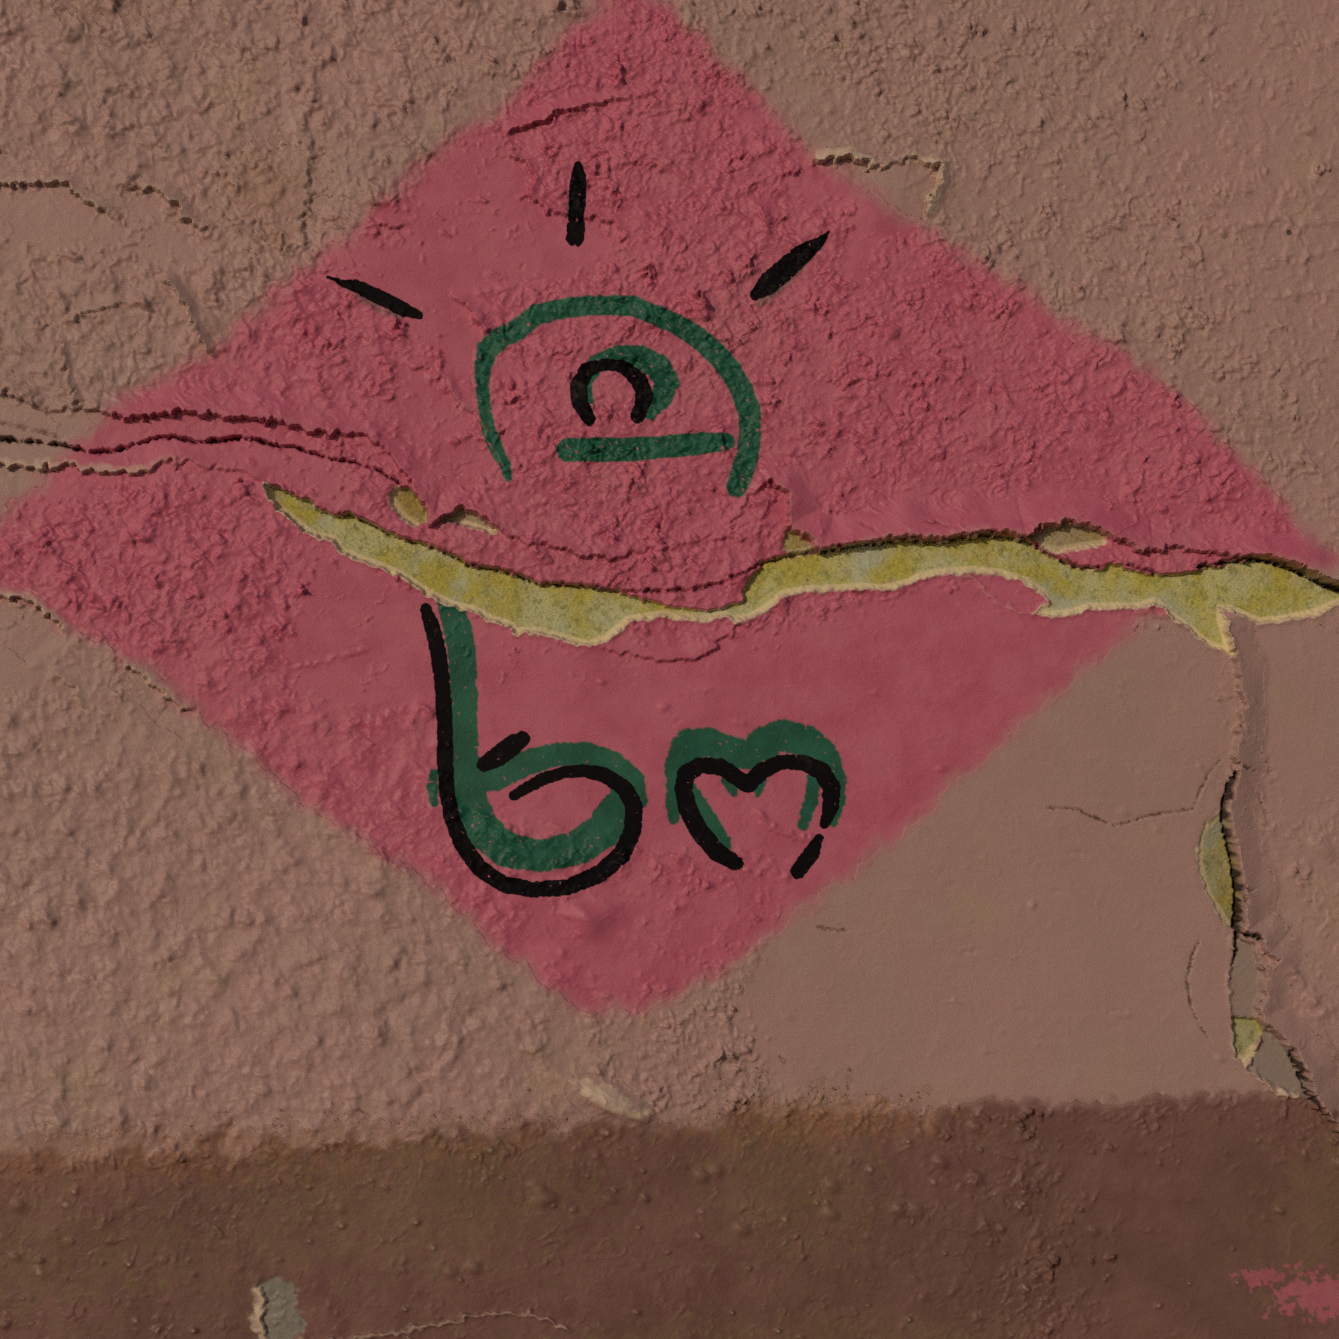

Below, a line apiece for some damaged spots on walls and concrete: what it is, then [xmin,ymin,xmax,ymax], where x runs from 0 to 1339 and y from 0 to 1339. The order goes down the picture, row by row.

peeling [0,170,220,233]
peeling [810,145,951,220]
crack [0,374,1339,1137]